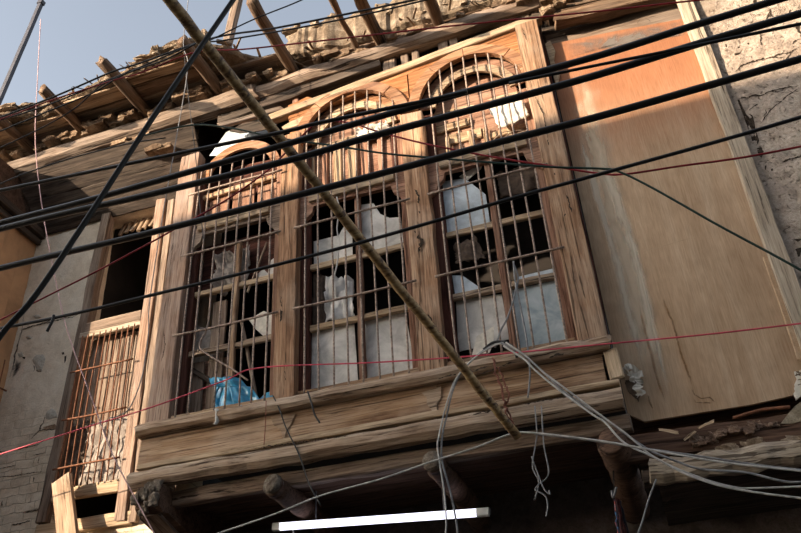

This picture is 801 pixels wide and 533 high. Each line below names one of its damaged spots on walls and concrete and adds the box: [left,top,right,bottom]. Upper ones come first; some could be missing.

crack [736,22,801,71]
crack [739,85,799,124]